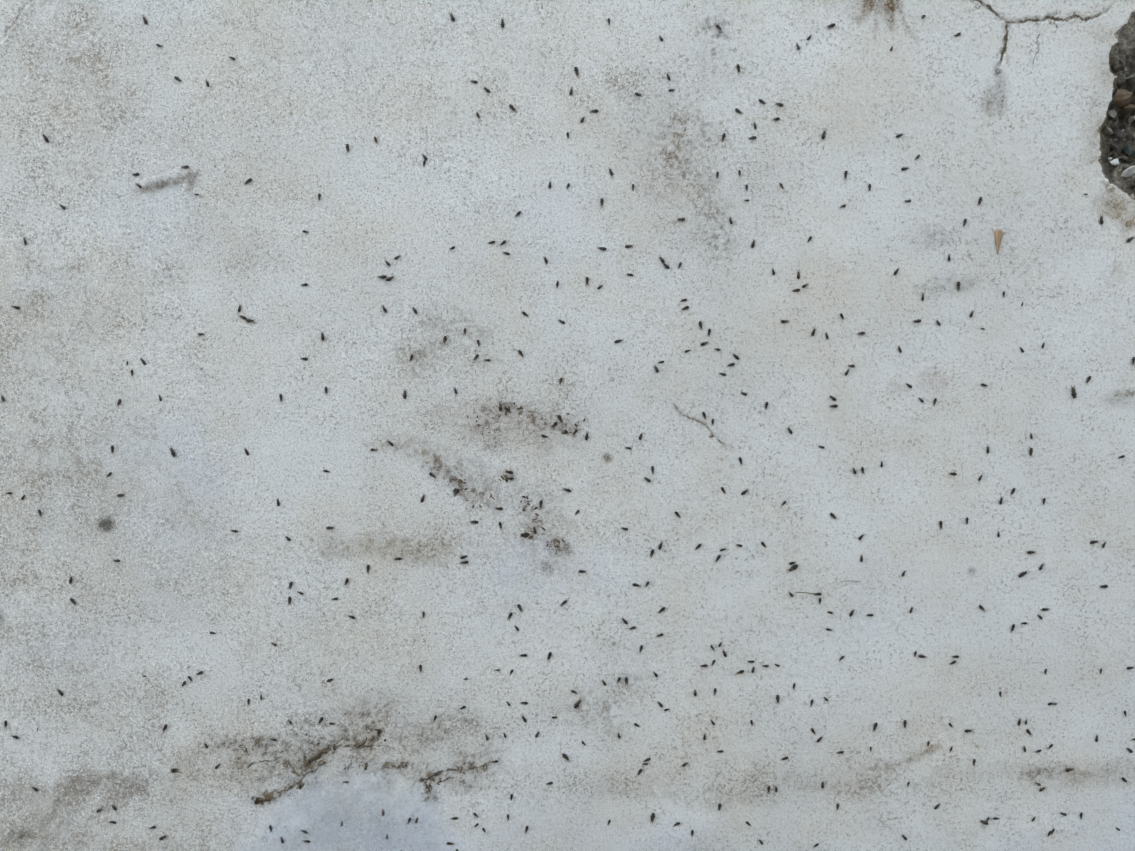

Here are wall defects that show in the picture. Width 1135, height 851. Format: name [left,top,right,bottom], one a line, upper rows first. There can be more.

crack [970,0,1100,64]
spalling [1098,12,1135,200]